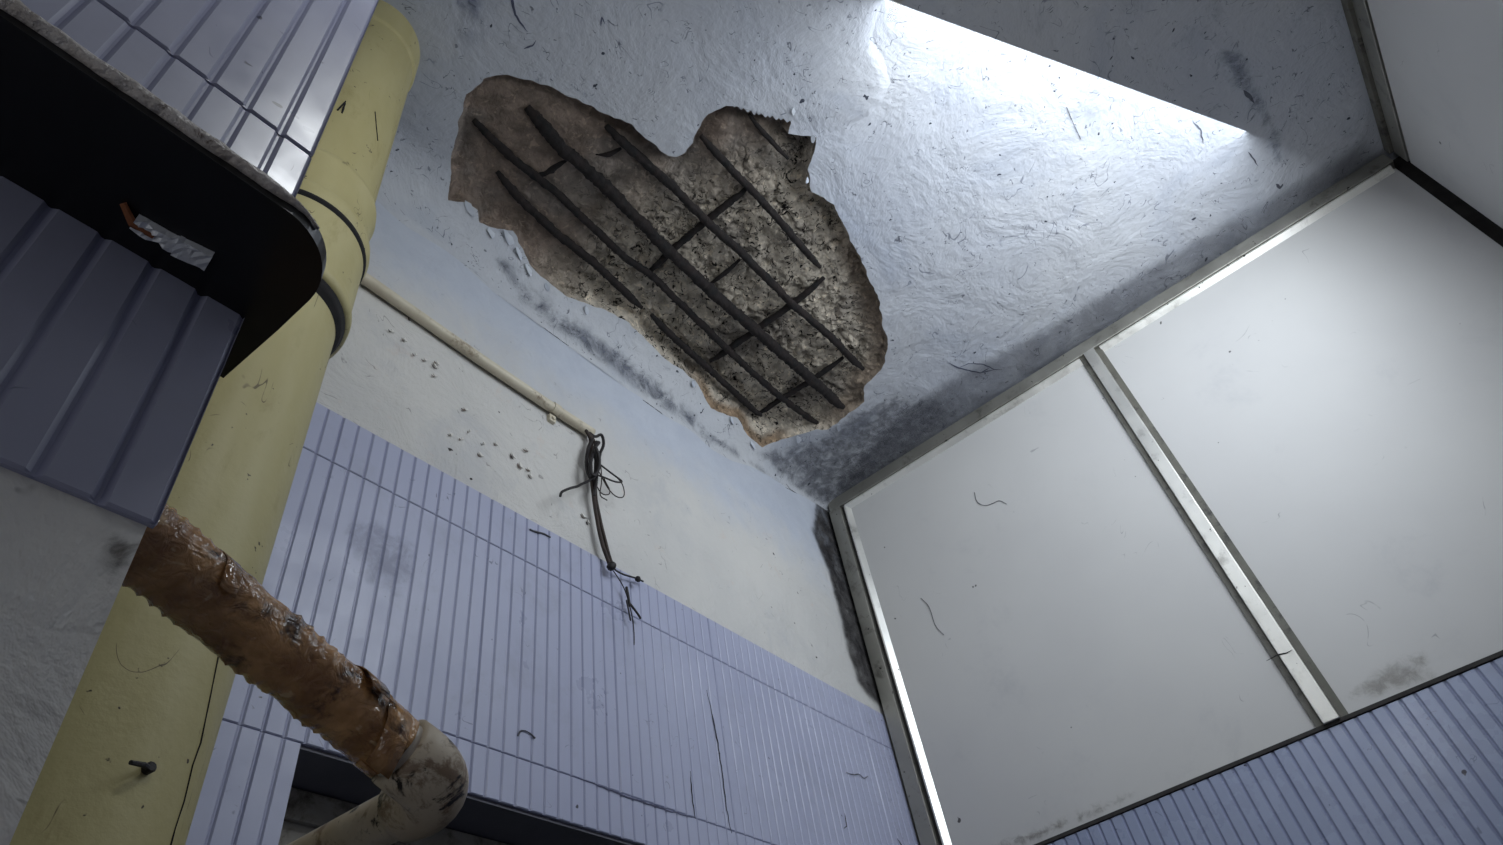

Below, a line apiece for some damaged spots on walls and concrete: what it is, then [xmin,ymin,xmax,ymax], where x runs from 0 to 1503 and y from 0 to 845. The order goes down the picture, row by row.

peeling [448,429,534,479]
damp [561,324,694,425]
spalling [448,75,888,449]
damp [772,402,938,705]